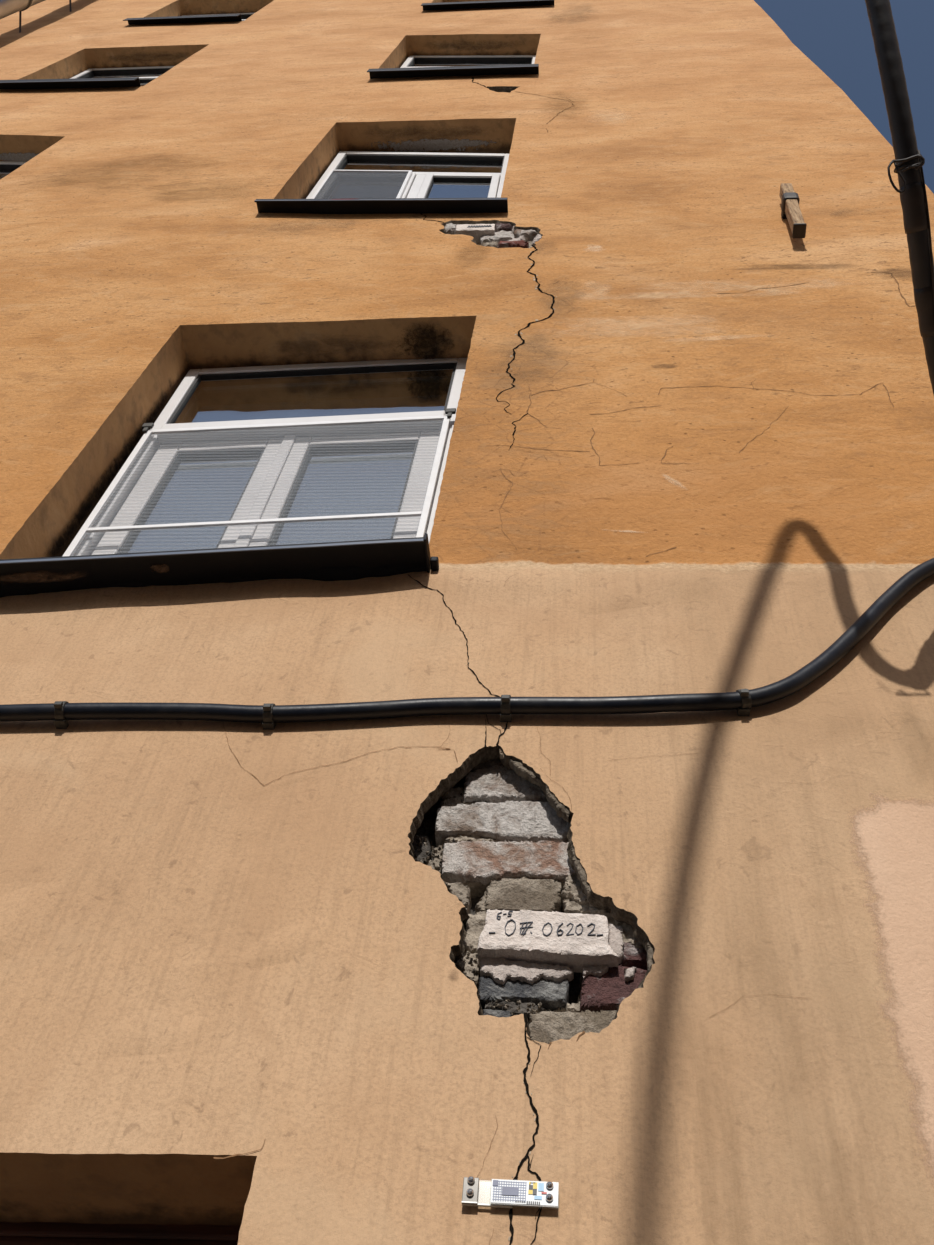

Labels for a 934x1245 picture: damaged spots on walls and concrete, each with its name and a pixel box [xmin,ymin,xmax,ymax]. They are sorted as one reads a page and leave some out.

flaking render [440,220,543,248]
crack [873,272,916,307]
crack [486,245,809,583]
flaking render [408,741,655,1044]
crack [489,1012,585,1245]